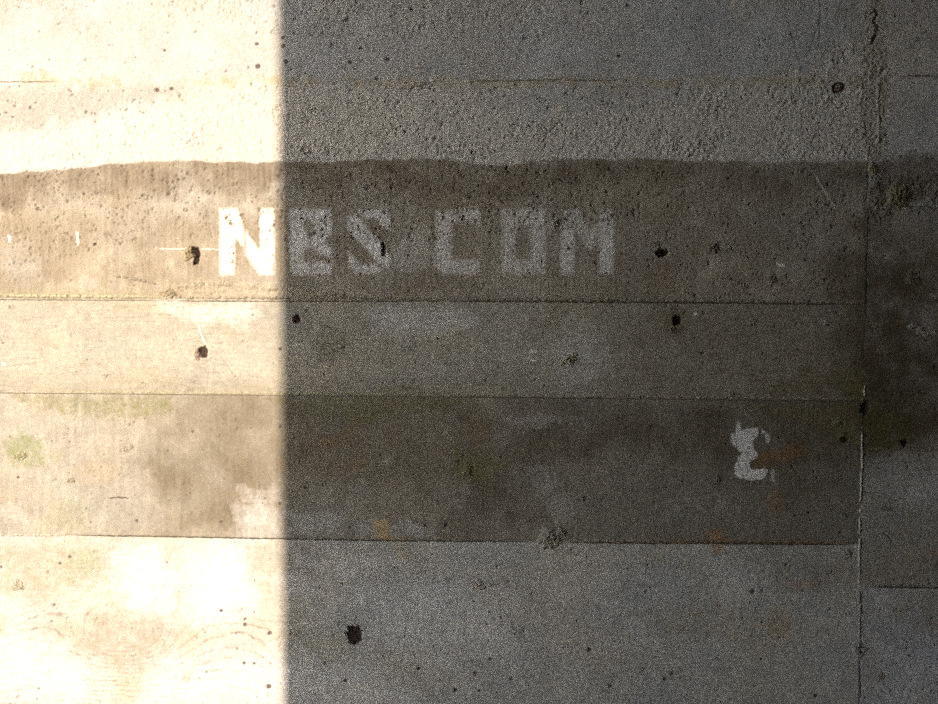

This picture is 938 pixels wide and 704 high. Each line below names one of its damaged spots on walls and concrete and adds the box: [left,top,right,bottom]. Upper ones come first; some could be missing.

crack [869,7,881,43]
damp [0,147,938,704]
corrosion [751,440,807,469]